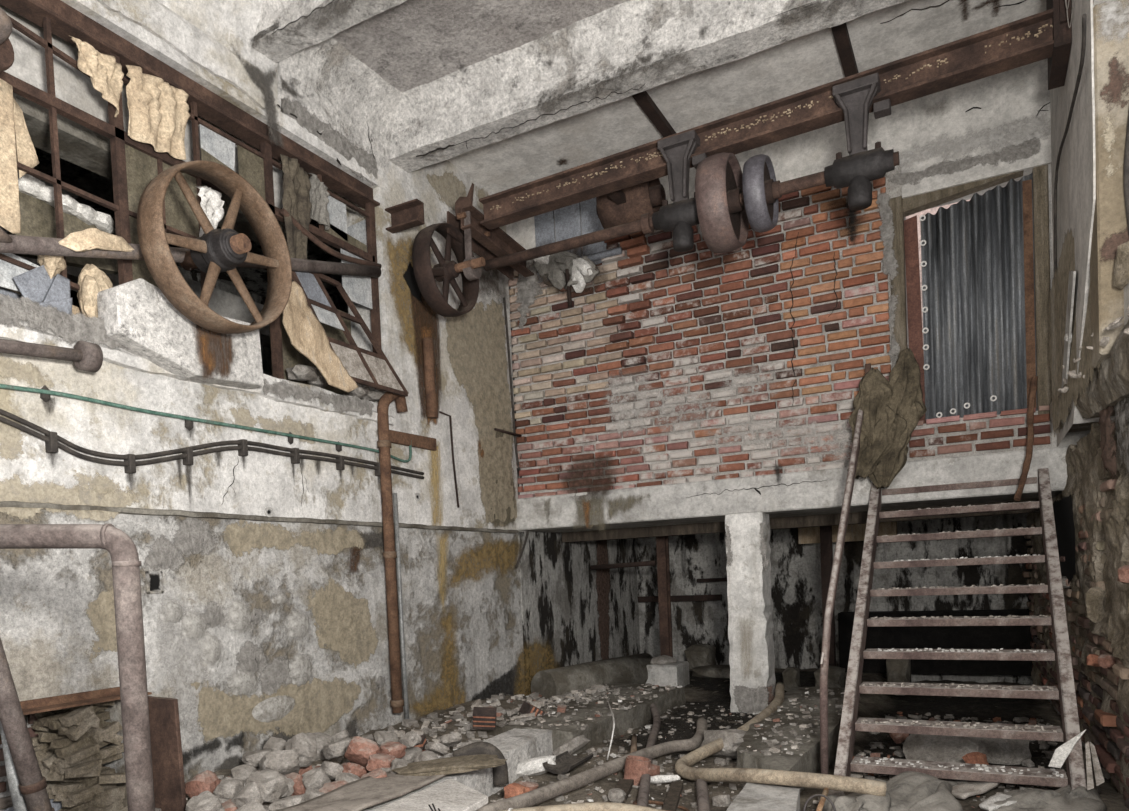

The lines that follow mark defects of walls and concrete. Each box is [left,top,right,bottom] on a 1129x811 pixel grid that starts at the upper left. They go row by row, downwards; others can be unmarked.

crack [880,0,950,24]
corrosion [959,0,1000,20]
crack [416,84,645,157]
flaking render [1100,56,1129,177]
corrosion [196,324,233,378]
flaking render [444,266,517,527]
flaking render [145,517,368,571]
water stain [450,538,518,586]
flaking render [190,577,379,743]
water stain [411,613,466,716]
water stain [515,642,557,696]
spalling [285,736,407,796]